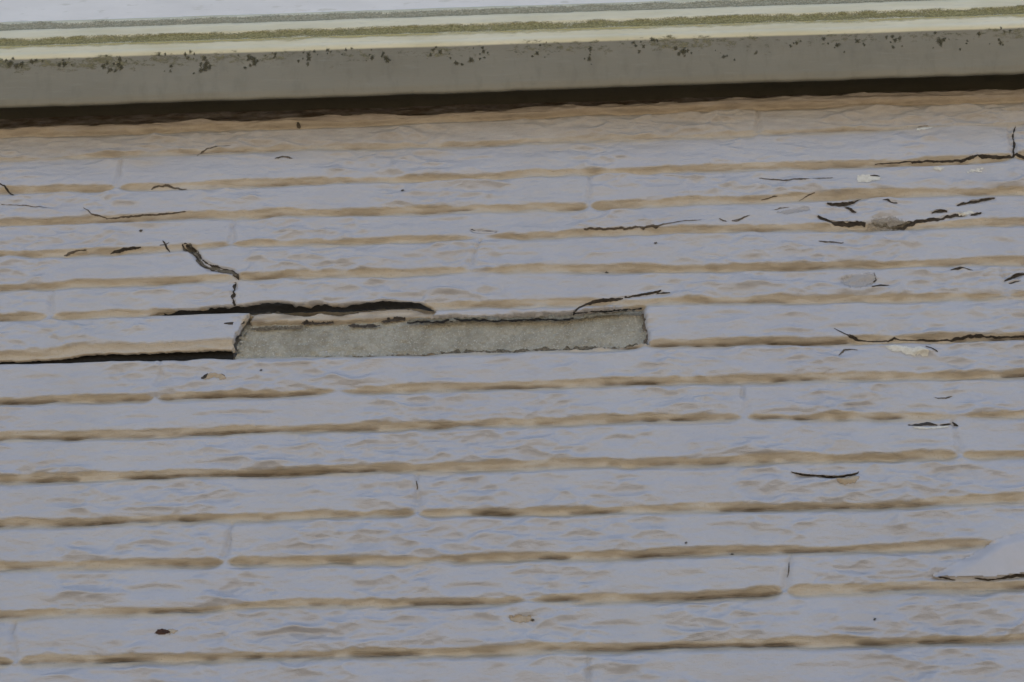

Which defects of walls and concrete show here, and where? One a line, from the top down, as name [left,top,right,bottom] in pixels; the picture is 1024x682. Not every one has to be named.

crack [875,126,1024,165]
crack [0,183,47,208]
crack [83,184,186,219]
crack [584,177,995,243]
crack [111,241,433,316]
crack [573,290,670,315]
spalling [235,308,648,359]
crack [834,328,1024,355]
crack [791,469,859,478]